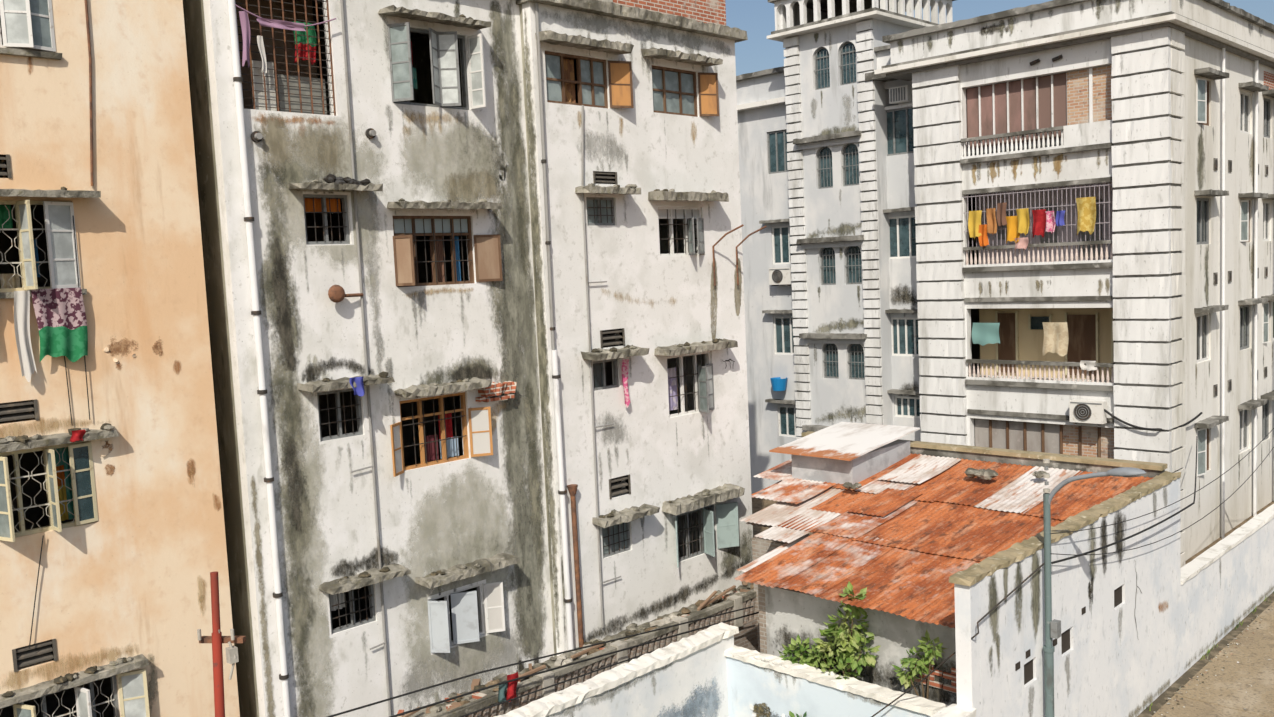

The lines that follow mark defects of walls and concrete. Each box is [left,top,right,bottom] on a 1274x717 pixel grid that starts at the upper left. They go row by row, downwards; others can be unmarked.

leakage [402,1,510,223]
leakage [258,118,392,394]
leakage [284,357,539,717]
leakage [660,681,720,717]
leakage [989,552,1040,665]
leakage [1088,513,1126,602]